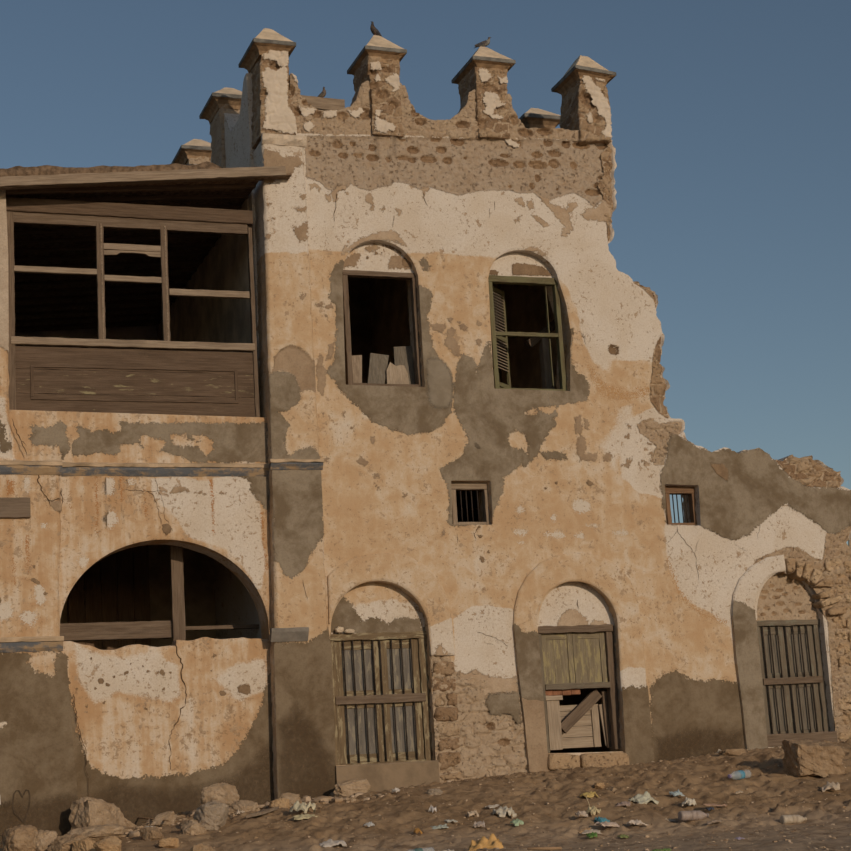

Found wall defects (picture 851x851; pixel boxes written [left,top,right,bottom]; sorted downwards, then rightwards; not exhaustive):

spalling [262,50,613,243]
spalling [272,343,335,396]
peeling [28,421,71,460]
crack [37,475,63,511]
crack [126,482,169,522]
spalling [776,456,841,488]
spalling [753,526,851,742]
crack [169,646,187,770]
spalling [431,643,550,783]